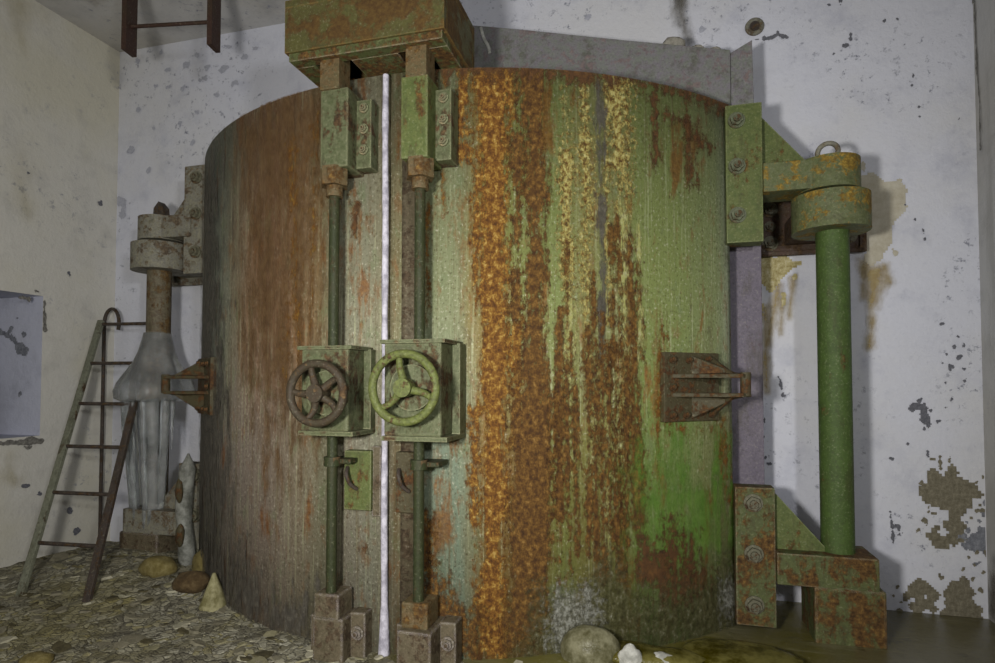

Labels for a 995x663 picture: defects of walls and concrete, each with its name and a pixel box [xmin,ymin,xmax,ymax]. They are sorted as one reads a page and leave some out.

flaking render [18,290,48,332]
peeling [0,317,29,356]
peeling [908,398,941,431]
flaking render [892,450,986,618]